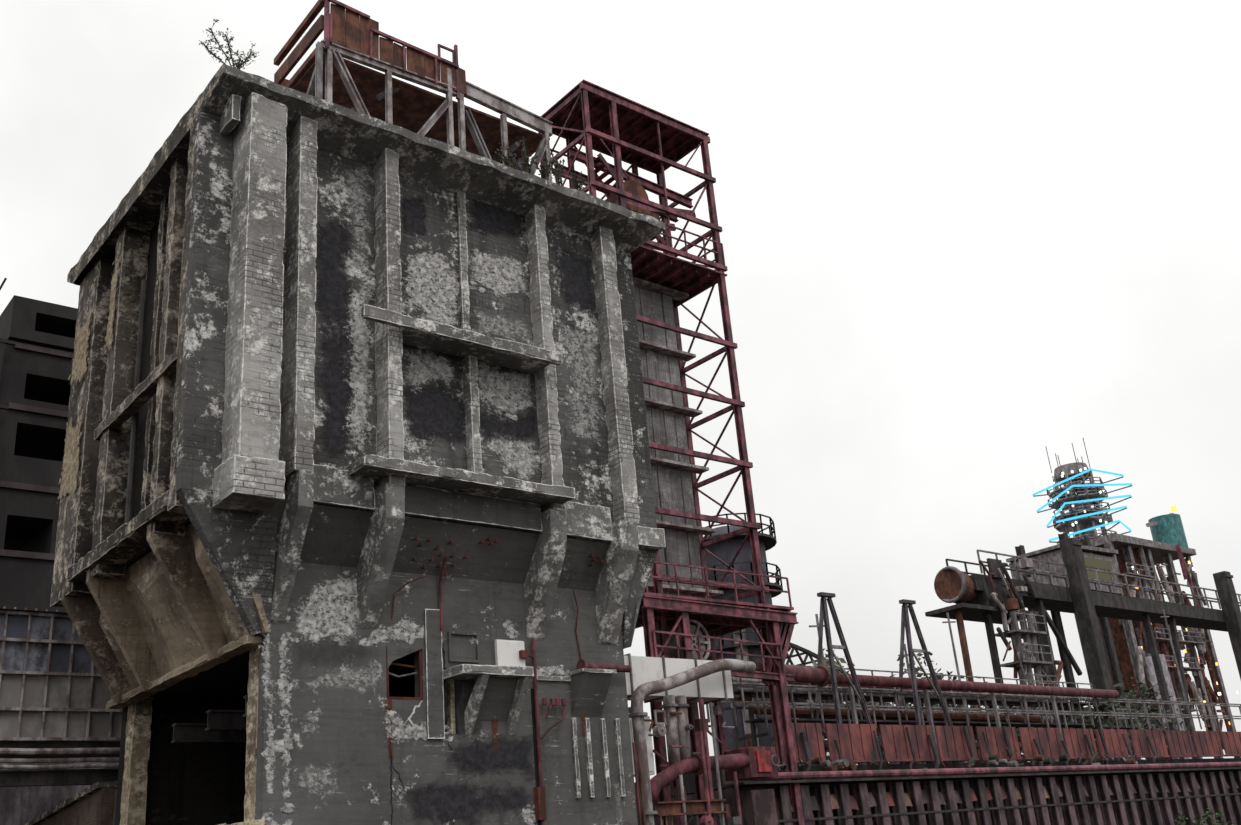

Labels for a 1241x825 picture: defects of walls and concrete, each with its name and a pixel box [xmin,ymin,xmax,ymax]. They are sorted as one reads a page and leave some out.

damp [470,199,525,235]
peeling [400,243,530,339]
peeling [258,571,424,825]
peeling [382,704,454,747]
damp [407,698,532,825]